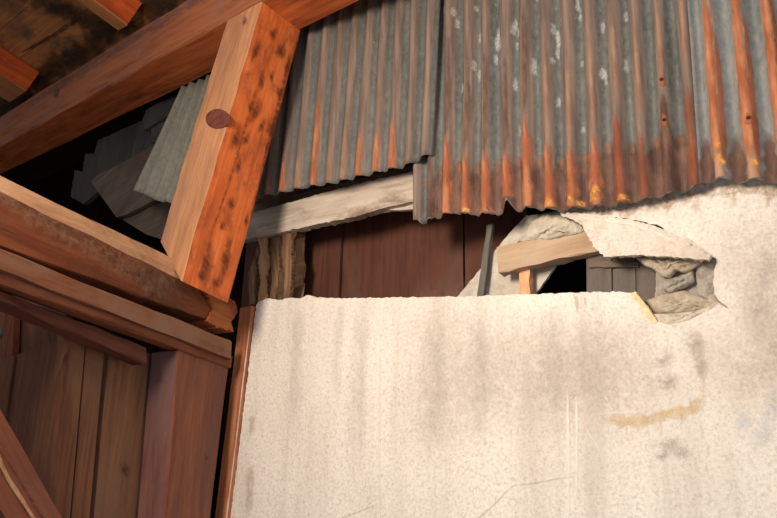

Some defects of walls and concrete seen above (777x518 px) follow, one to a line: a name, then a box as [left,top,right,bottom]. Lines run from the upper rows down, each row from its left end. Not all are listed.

rust [310,103,319,184]
rust [372,123,396,171]
rust [427,0,777,218]
spalling [558,211,719,325]